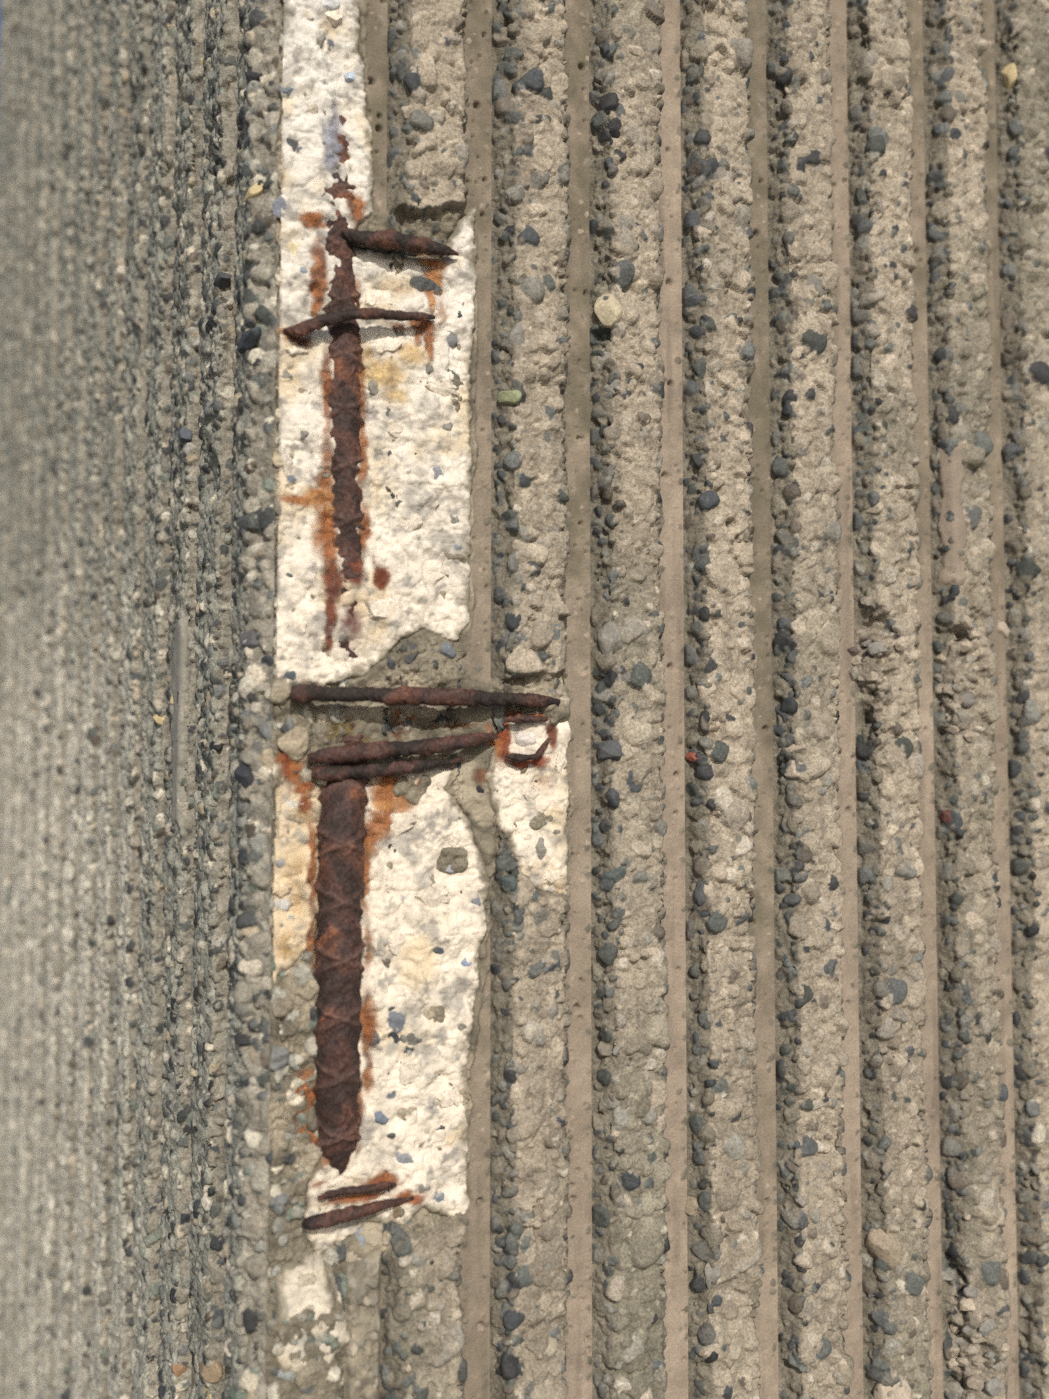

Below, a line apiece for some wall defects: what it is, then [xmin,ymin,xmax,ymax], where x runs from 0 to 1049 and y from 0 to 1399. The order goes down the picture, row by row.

corrosion [279,328,310,346]
corrosion [302,212,327,314]
spalling [238,0,481,687]
corrosion [393,255,445,360]
flaking render [497,390,522,405]
corrosion [282,440,390,649]
corrosion [484,711,557,769]
corrosion [277,752,317,969]
corrosion [361,776,412,908]
corrosion [357,994,375,1116]
spalling [270,676,575,1382]
corrosion [330,1172,423,1206]